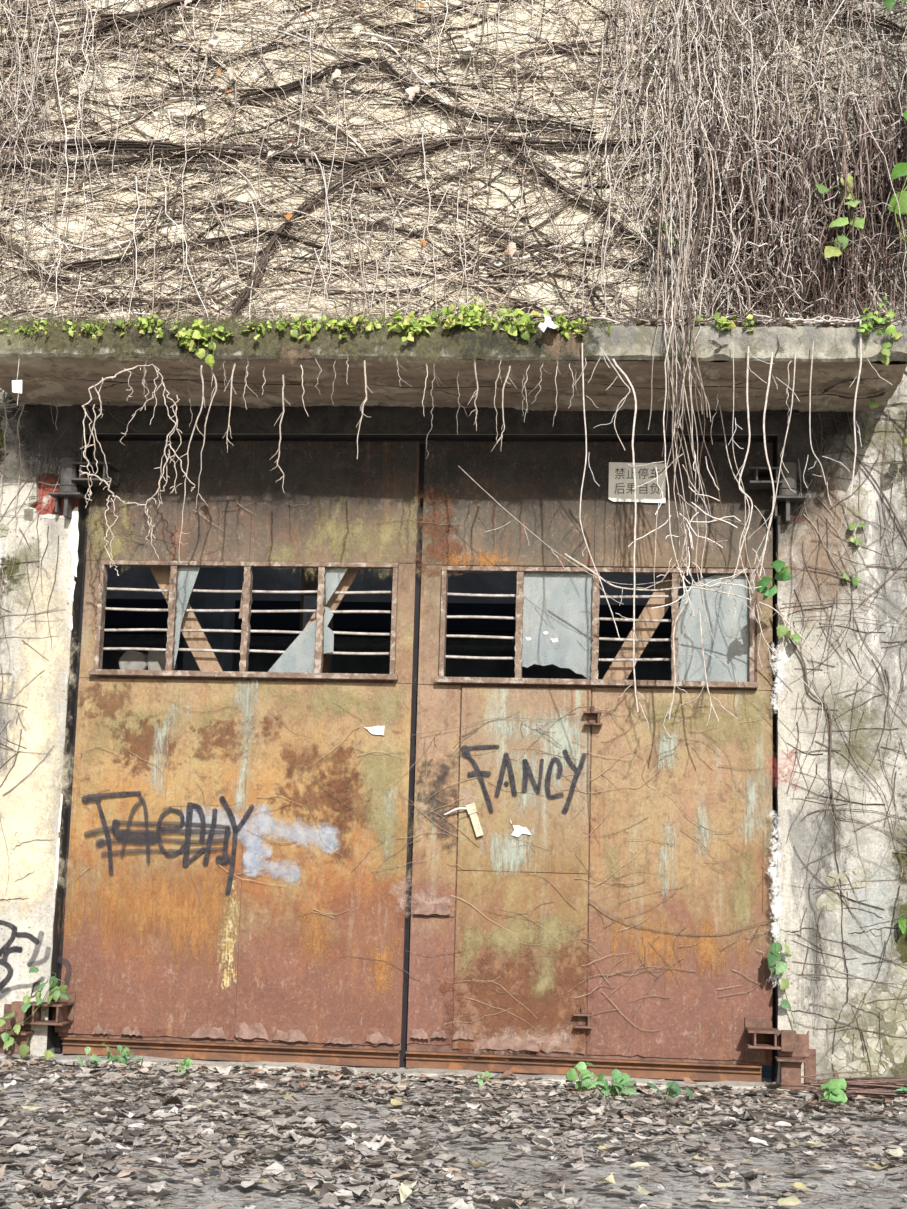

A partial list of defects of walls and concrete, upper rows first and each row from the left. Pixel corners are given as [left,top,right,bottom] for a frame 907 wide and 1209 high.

leakage [849,471,905,707]
corrosion [77,681,176,776]
corrosion [190,715,375,864]
peeling [92,1024,142,1039]
corrosion [65,865,238,990]
peeling [190,1022,308,1042]
peeling [325,1031,394,1047]
peeling [410,1026,539,1052]
corrosion [440,931,595,1060]
leakage [809,896,822,997]
crack [781,813,907,1077]
leakage [824,812,894,977]